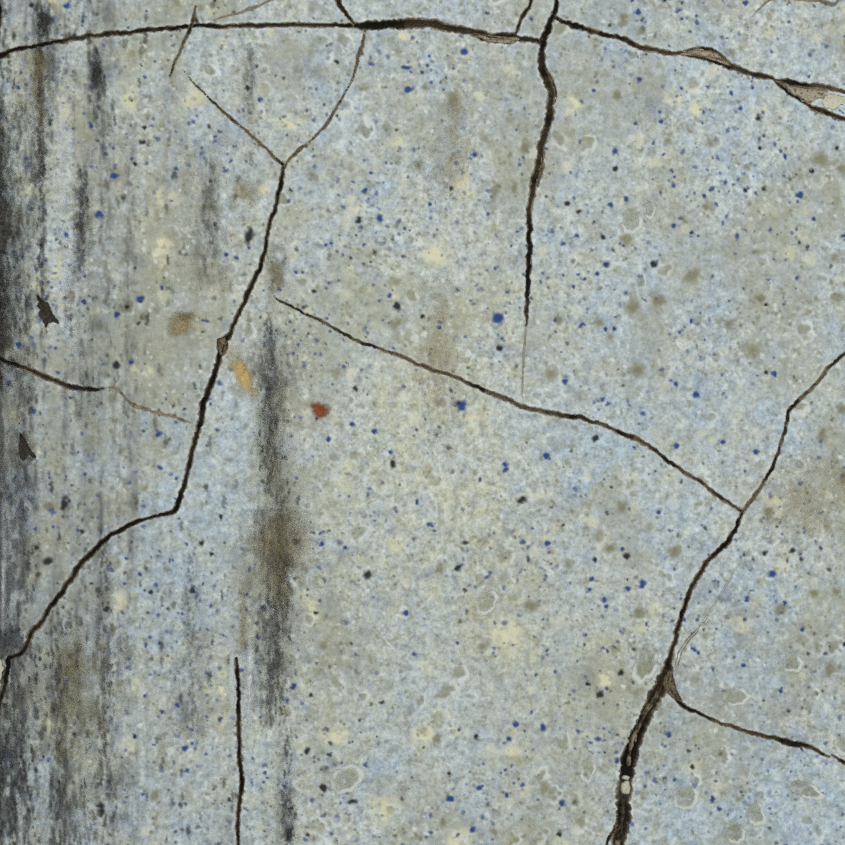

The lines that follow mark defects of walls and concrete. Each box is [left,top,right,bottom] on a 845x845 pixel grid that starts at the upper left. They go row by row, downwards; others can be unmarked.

leakage [0,127,23,351]
leakage [91,61,101,88]
crack [0,0,845,326]
spalling [779,82,845,110]
crack [0,30,366,715]
leakage [3,455,29,591]
crack [273,296,845,845]
crack [234,658,245,845]
leakage [248,651,282,703]